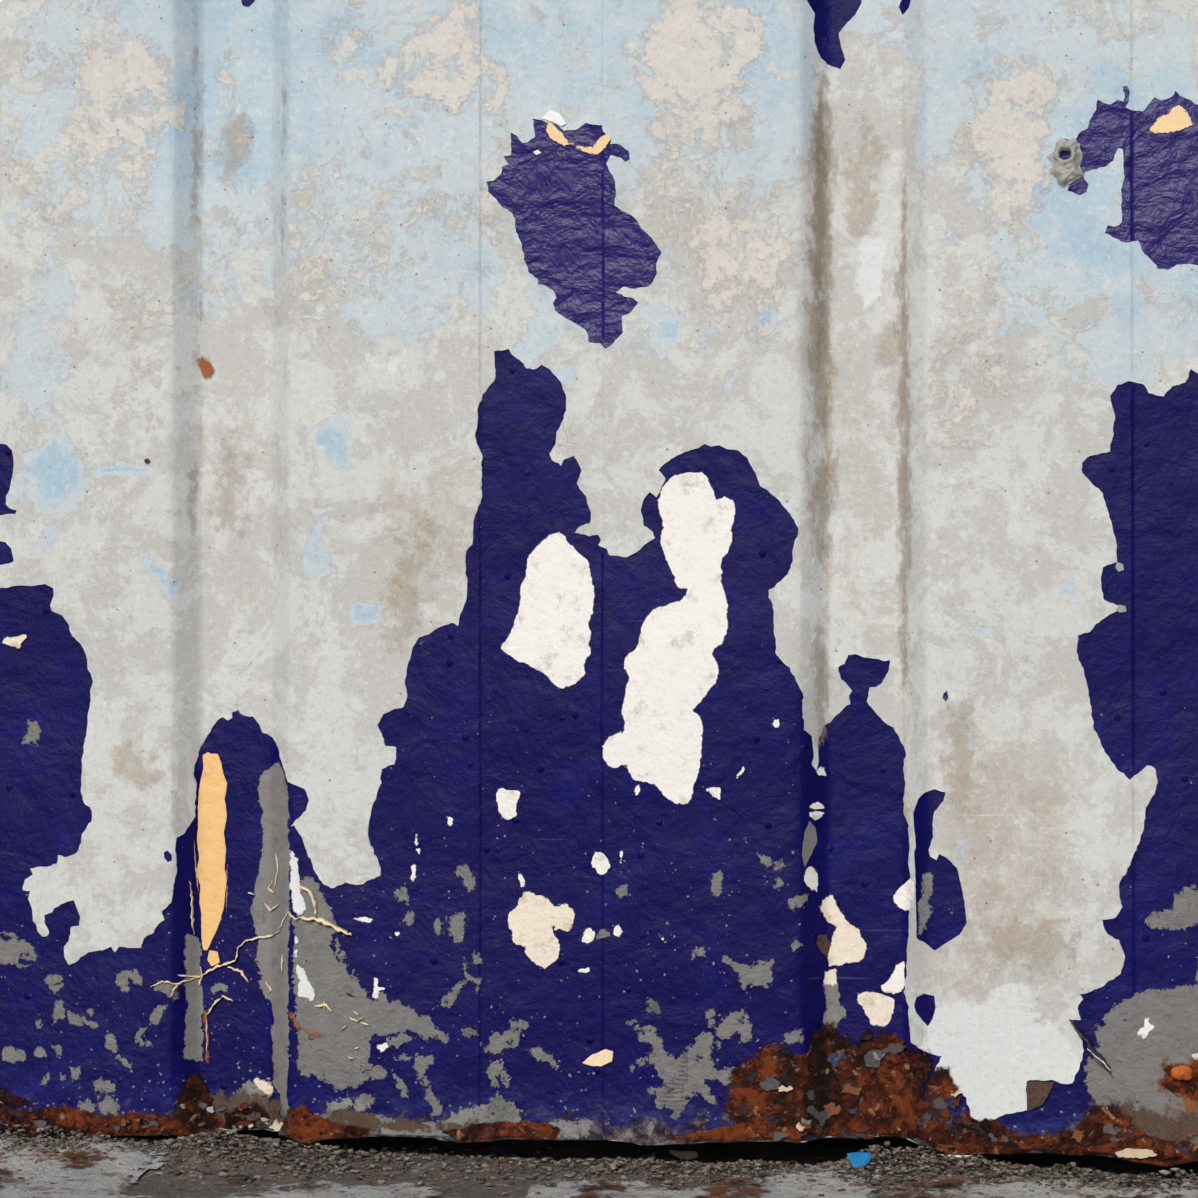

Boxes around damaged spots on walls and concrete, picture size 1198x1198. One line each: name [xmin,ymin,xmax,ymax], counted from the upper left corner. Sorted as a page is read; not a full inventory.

peeling [807,0,862,69]
peeling [899,0,911,15]
corrosion [197,356,213,379]
peeling [0,349,966,1148]
peeling [994,369,1198,1161]
crack [150,911,304,1051]
corrosion [0,1072,559,1172]
corrosion [667,1022,1198,1167]
peeling [948,1089,977,1121]